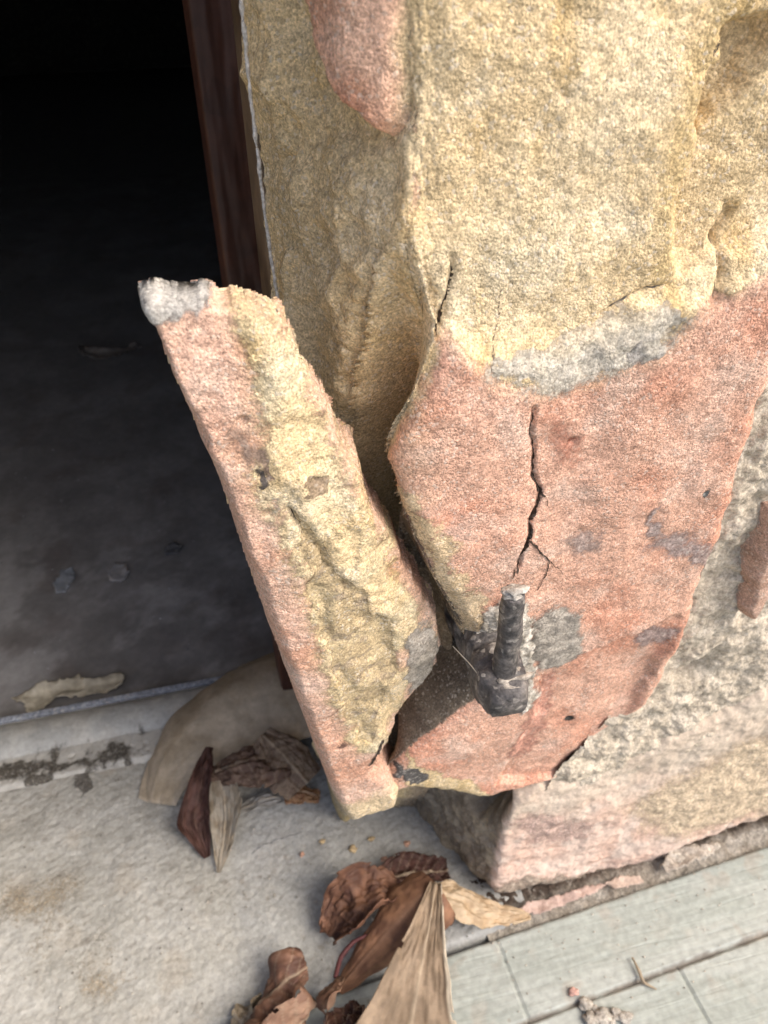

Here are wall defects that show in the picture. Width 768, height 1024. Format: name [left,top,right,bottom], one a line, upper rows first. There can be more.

crack [512,406,563,590]